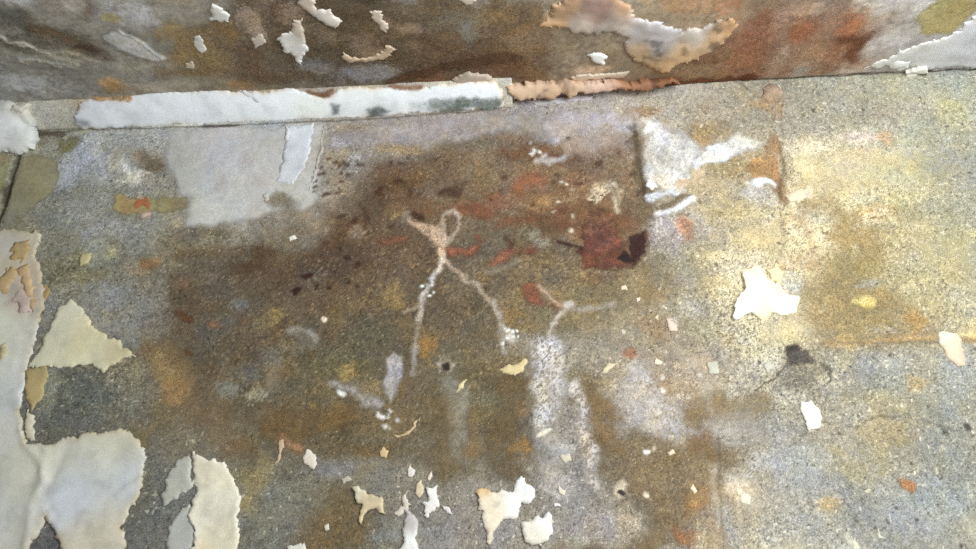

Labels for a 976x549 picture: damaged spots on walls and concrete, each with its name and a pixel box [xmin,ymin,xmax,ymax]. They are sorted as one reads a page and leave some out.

peeling [0,35,91,68]
corrosion [664,8,879,86]
peeling [863,16,976,76]
peeling [74,0,739,253]
corrosion [557,196,647,270]
peeling [0,100,147,549]
water stain [153,97,768,549]
peeling [732,262,800,324]
peeling [499,358,528,376]
peeling [707,361,719,374]
peeling [160,451,241,549]
peeling [476,476,566,548]